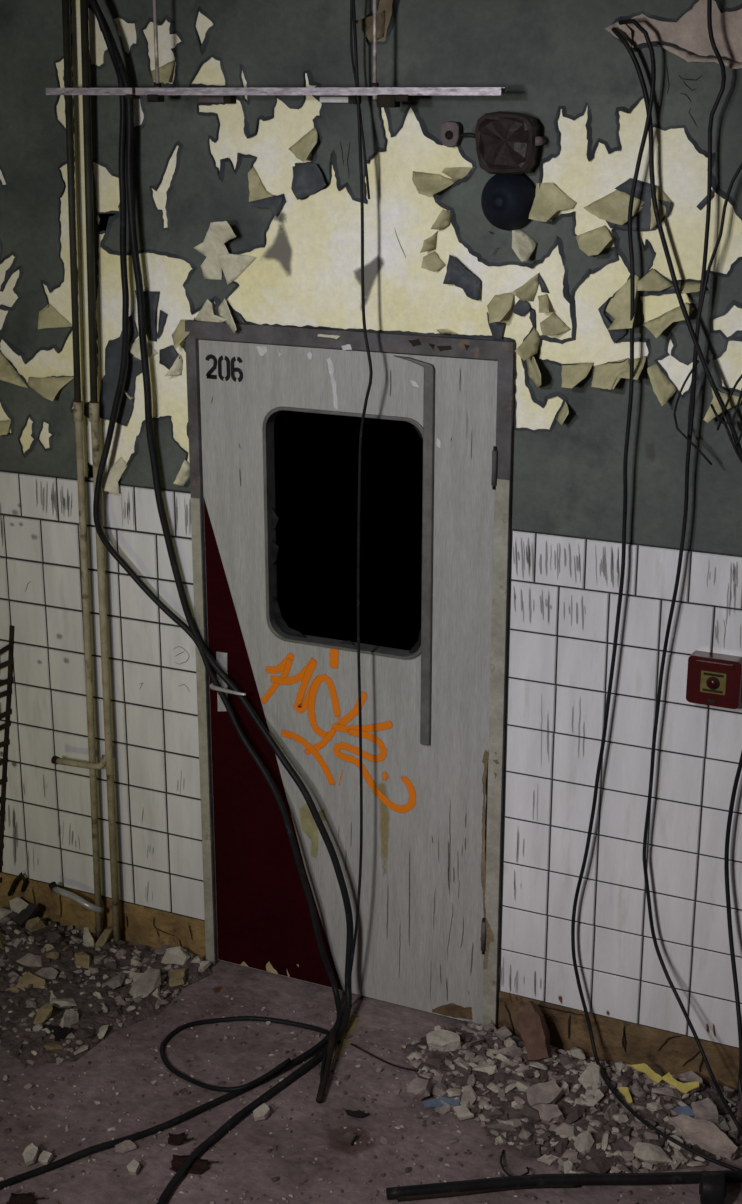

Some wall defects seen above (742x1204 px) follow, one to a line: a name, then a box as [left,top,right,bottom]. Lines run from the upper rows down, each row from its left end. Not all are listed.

peeling [0,0,742,494]